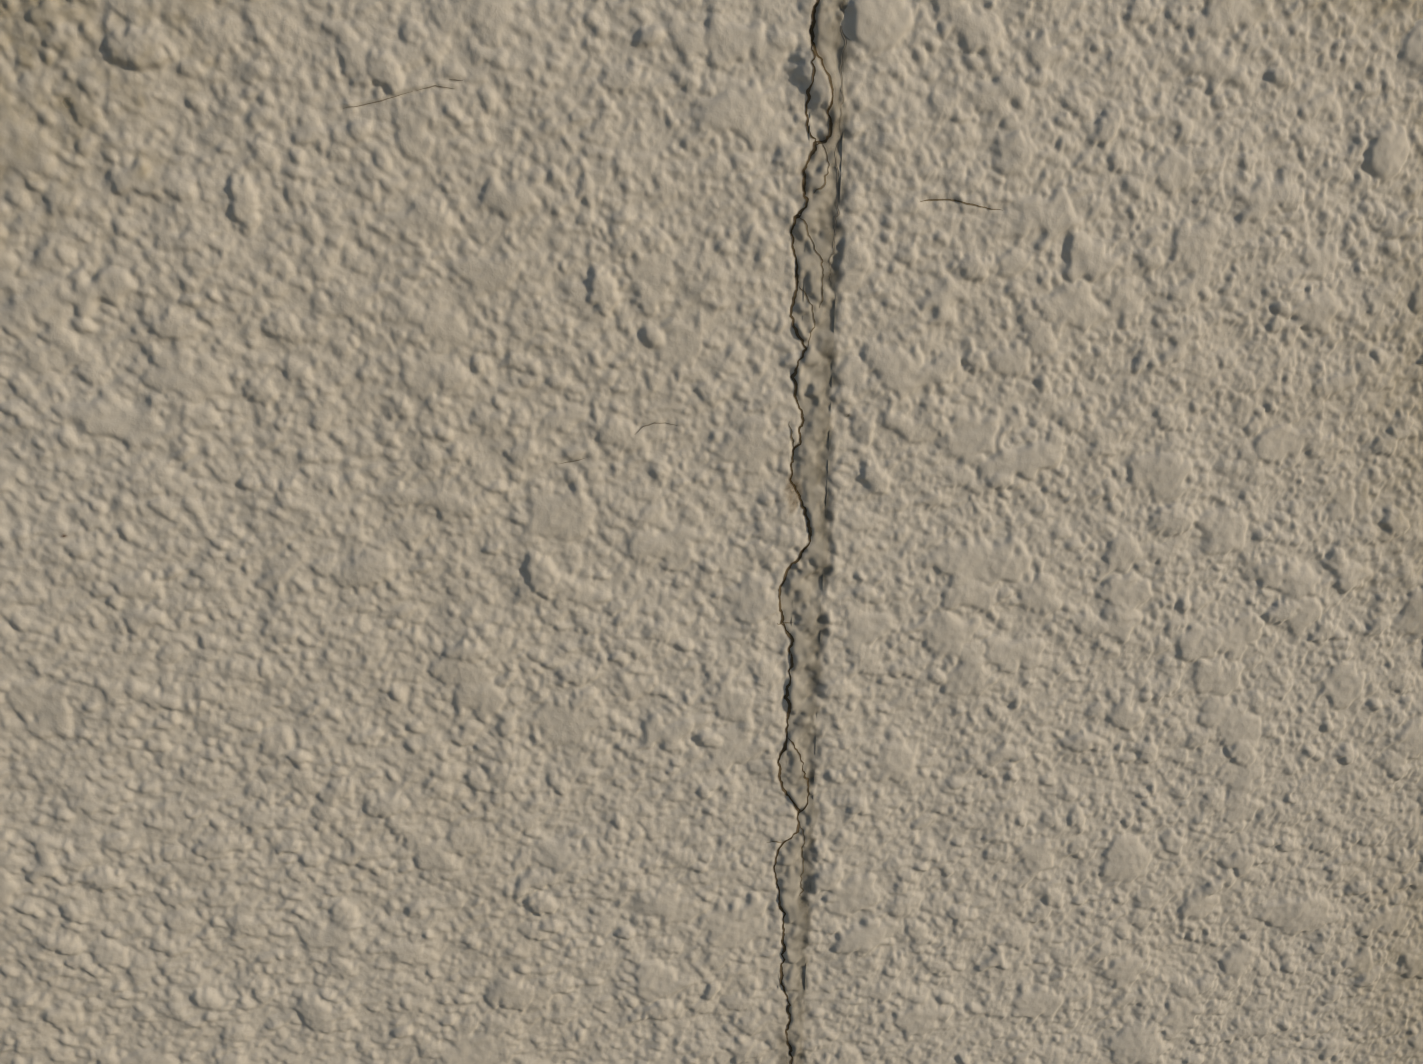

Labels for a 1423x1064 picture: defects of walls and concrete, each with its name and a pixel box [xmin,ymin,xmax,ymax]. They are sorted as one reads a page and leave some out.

crack [767,0,847,1064]